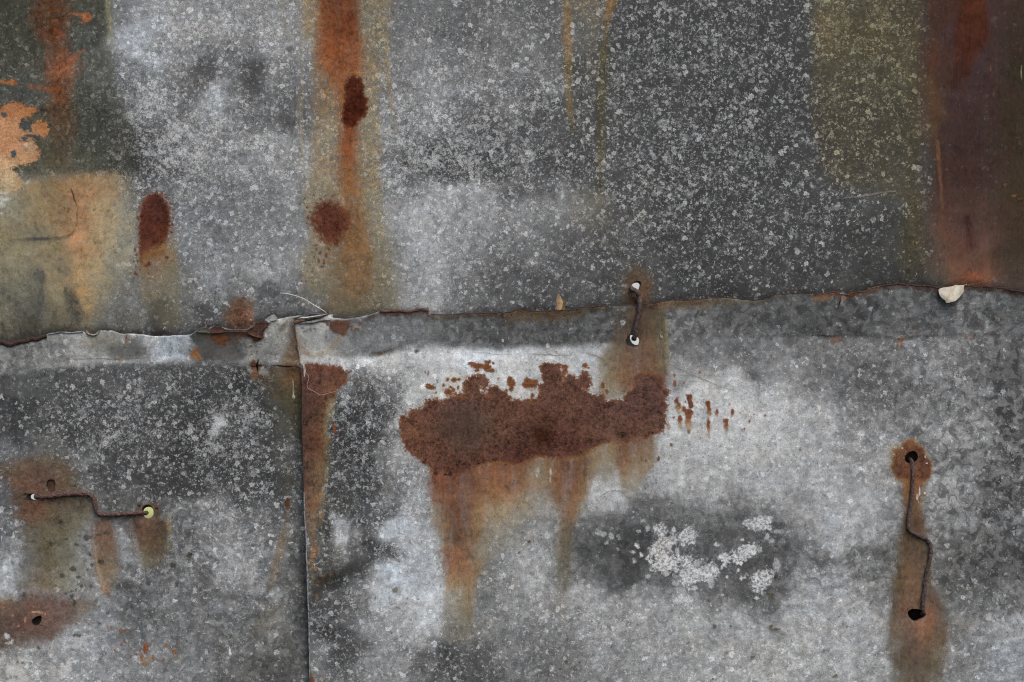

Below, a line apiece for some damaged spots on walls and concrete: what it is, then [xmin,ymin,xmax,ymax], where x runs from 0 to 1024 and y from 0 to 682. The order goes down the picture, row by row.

corrosion [133,183,176,278]
corrosion [304,0,373,301]
corrosion [925,0,1024,295]
corrosion [0,458,118,647]
corrosion [107,626,179,671]
corrosion [132,504,168,566]
corrosion [275,306,609,597]
corrosion [398,271,752,610]
corrosion [890,439,948,682]